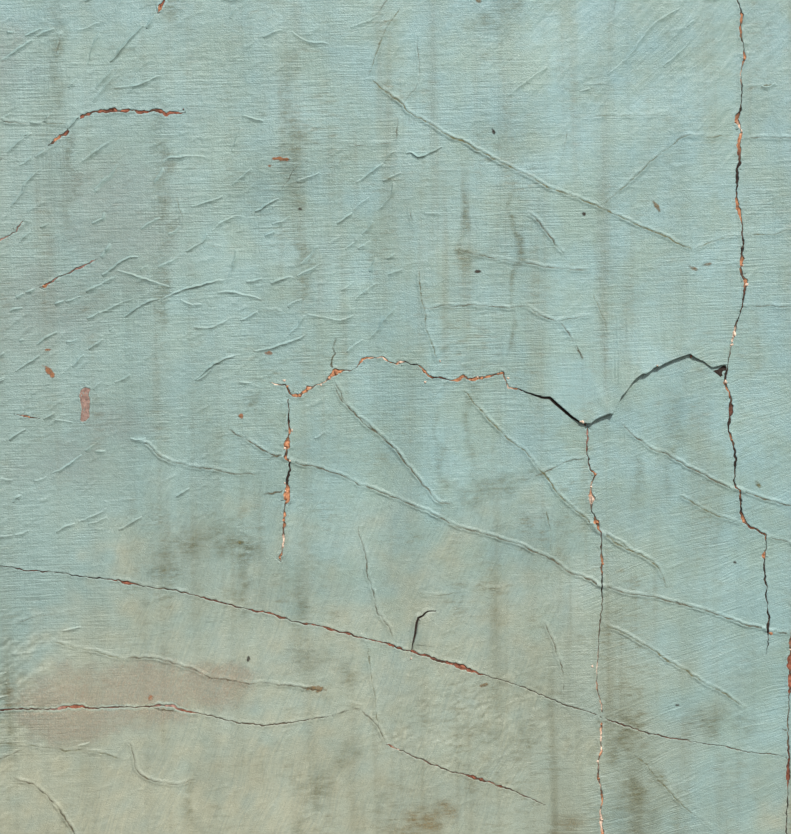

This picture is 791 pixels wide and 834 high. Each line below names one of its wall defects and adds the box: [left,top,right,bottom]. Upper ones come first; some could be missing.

crack [155,0,168,13]
crack [48,103,186,146]
crack [0,219,24,245]
crack [582,200,683,246]
crack [39,258,98,290]
crack [675,0,774,654]
crack [14,411,40,422]
peeling [78,385,92,424]
crack [232,347,530,562]
crack [0,426,791,834]